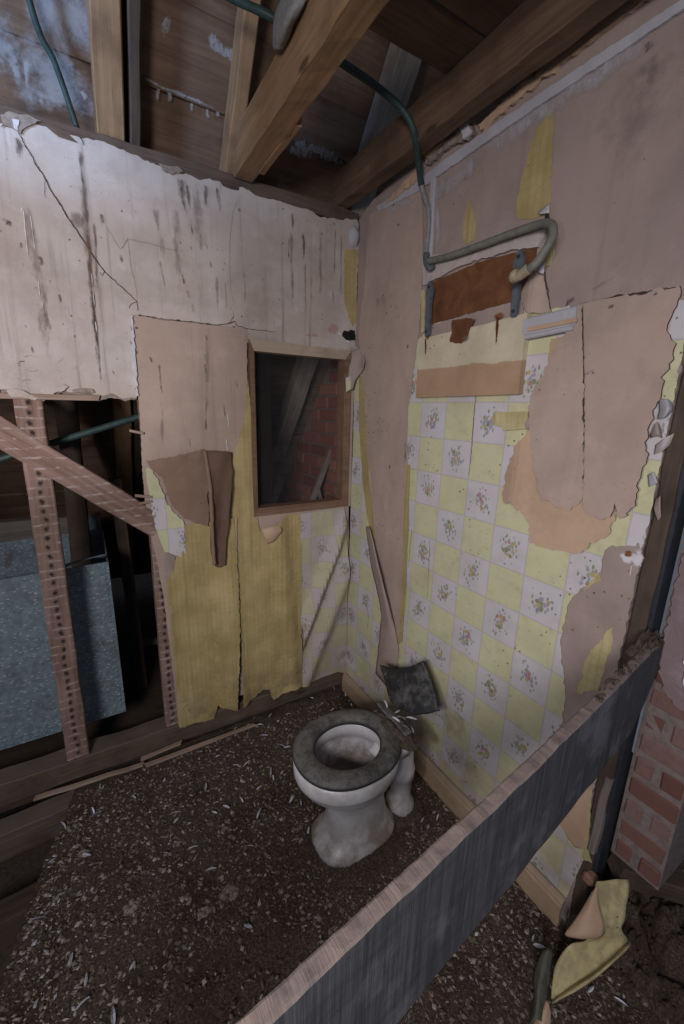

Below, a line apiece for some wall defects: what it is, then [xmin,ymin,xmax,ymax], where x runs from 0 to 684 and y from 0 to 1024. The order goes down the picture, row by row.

damp [0,30,86,106]
damp [39,0,90,46]
efflorescence [146,78,219,117]
efflorescence [210,34,232,61]
spalling [386,0,650,204]
damp [79,155,103,372]
crack [18,133,271,332]
peeling [450,318,475,344]
crack [578,286,681,500]